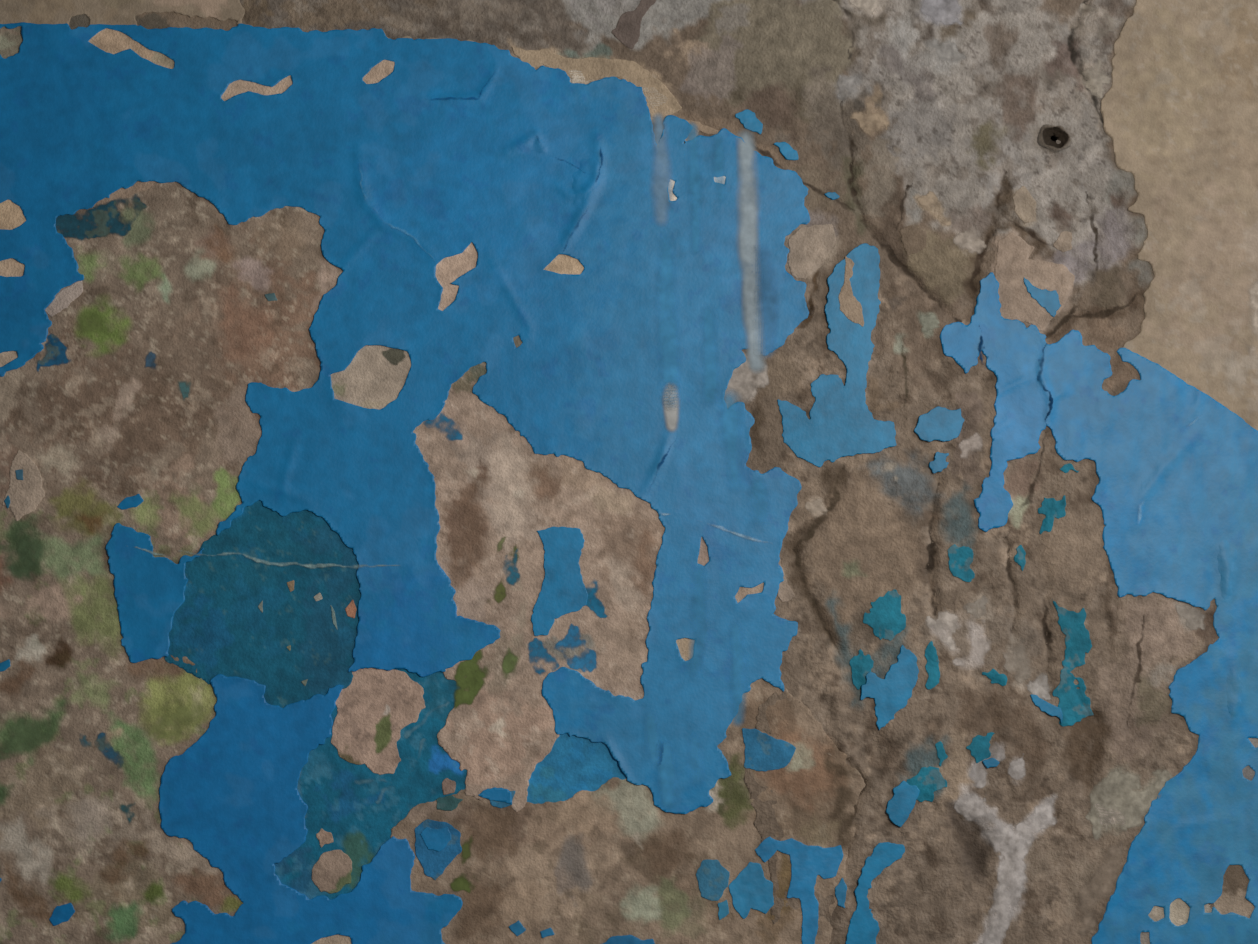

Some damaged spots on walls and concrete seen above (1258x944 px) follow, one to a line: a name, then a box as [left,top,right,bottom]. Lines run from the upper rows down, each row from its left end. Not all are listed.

peeling [69,14,175,69]
peeling [221,75,293,101]
water stain [654,117,670,223]
water stain [739,133,774,371]
water stain [661,245,678,431]
spalling [240,0,1219,944]
peeling [0,181,411,944]
crack [926,527,937,615]
crack [1006,548,1014,582]
crack [1042,609,1052,650]
crack [1127,616,1144,724]
peeling [1140,865,1255,944]